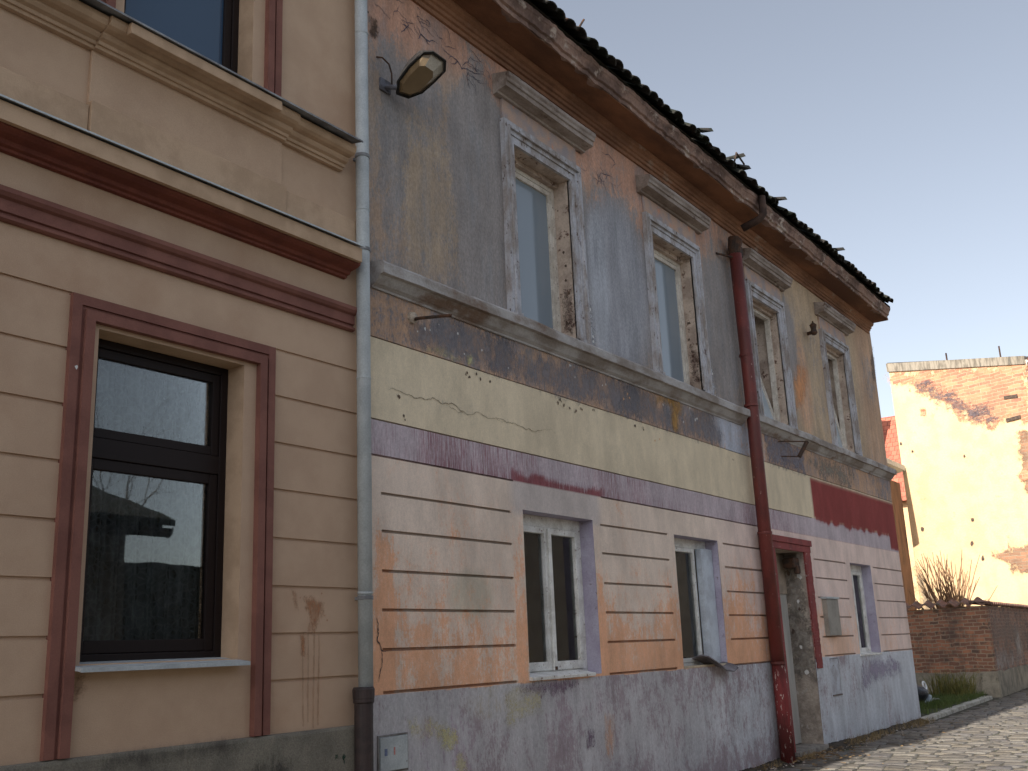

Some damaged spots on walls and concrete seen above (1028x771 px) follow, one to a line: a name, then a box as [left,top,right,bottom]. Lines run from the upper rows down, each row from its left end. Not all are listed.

crack [377,0,492,88]
crack [391,388,553,432]
spalling [871,348,1028,493]
spalling [981,544,1028,573]